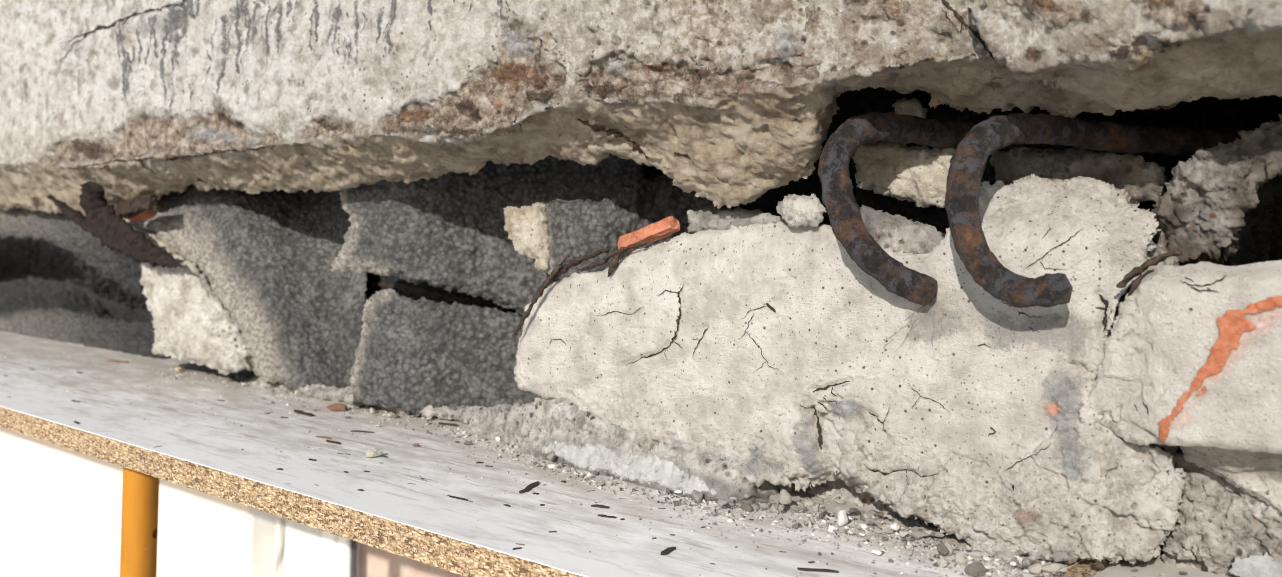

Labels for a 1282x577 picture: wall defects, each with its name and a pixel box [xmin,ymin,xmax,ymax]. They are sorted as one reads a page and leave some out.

crack [59,0,188,66]
damp [115,0,396,113]
corrosion [47,181,185,268]
crack [1179,275,1227,293]
crack [598,286,708,364]
crack [742,303,781,372]
crack [800,381,850,449]
crack [868,383,952,432]
spalling [1158,296,1282,514]
crack [870,469,938,485]